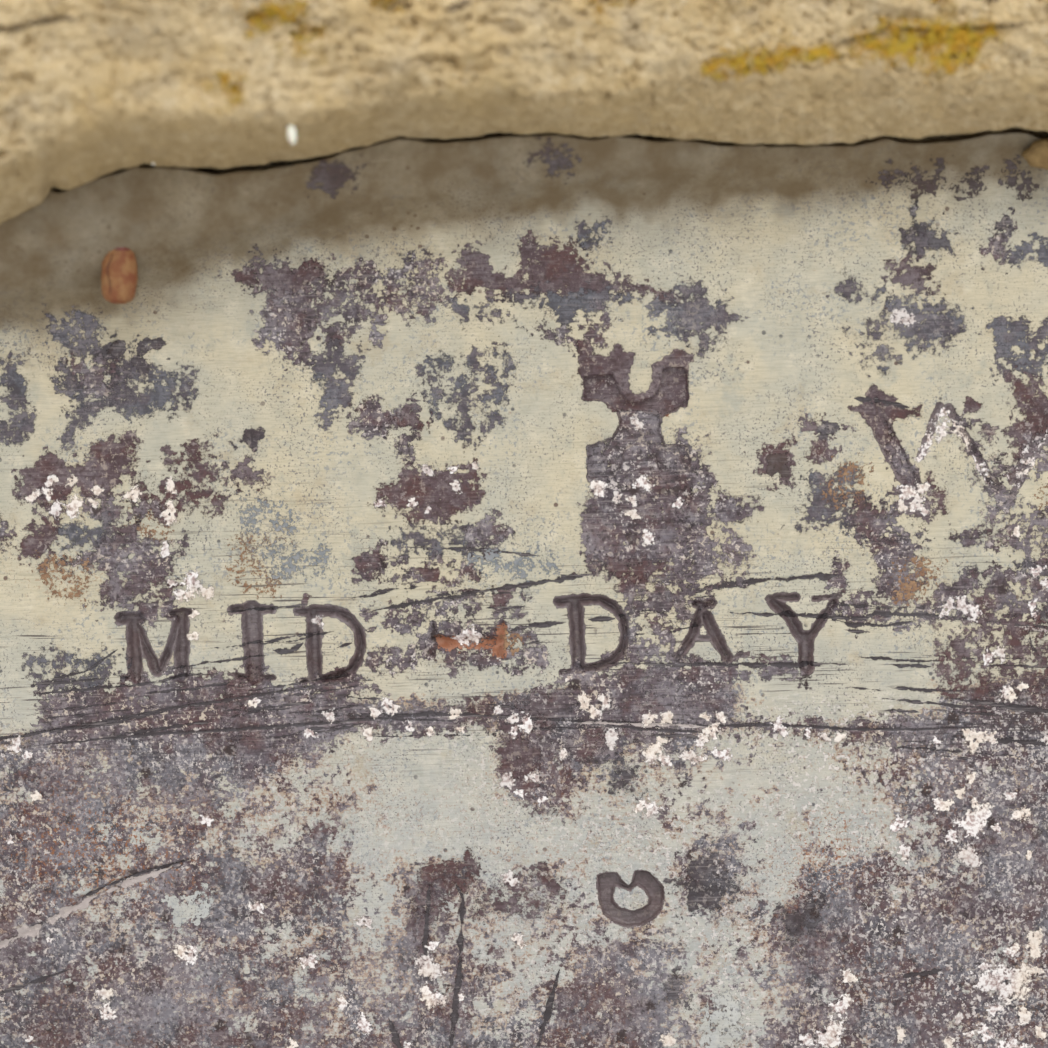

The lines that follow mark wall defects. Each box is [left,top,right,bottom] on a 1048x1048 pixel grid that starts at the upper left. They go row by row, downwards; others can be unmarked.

peeling [16,643,133,704]
peeling [0,304,275,633]
rust [434,622,531,661]
peeling [218,197,1048,817]